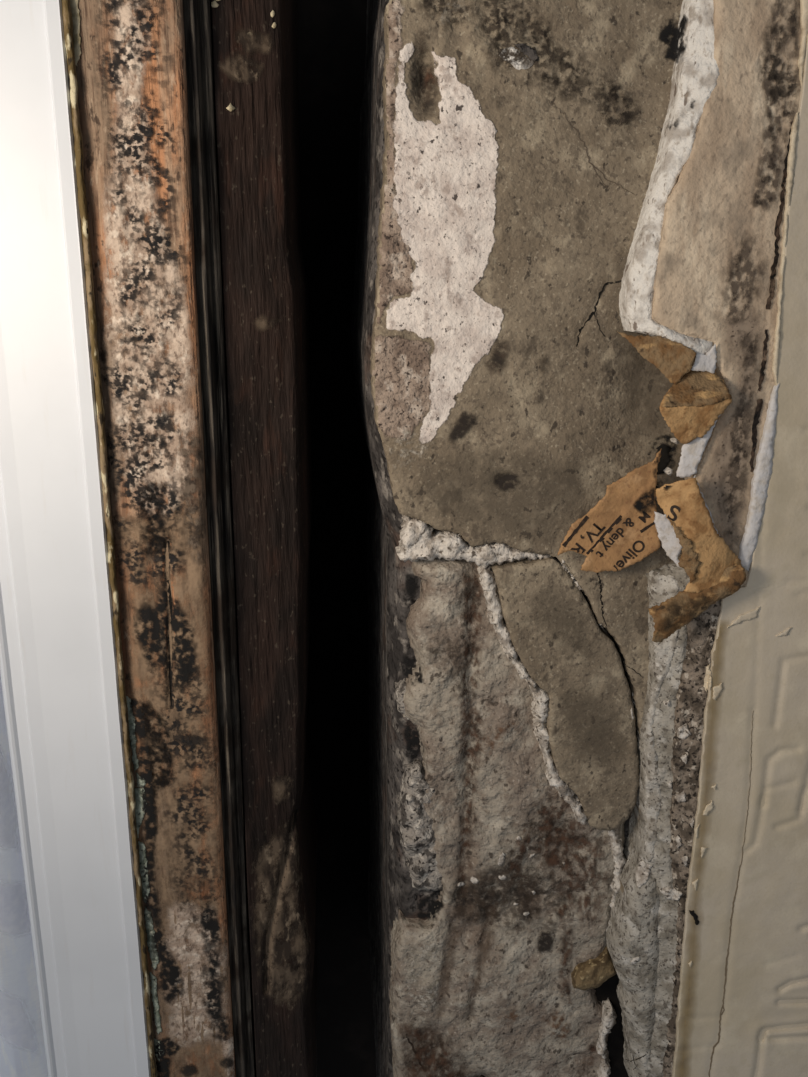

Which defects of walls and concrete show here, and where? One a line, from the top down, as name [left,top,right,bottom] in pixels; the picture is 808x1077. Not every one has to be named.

mould [101,0,168,90]
mould [110,92,185,324]
peeling [372,0,504,464]
water stain [482,0,591,100]
mould [728,243,765,322]
mould [753,0,799,208]
mould [725,336,757,517]
mould [105,320,229,1040]
crack [526,557,642,765]
crack [709,711,754,1077]
mould [155,1038,197,1077]
crack [593,974,629,1077]